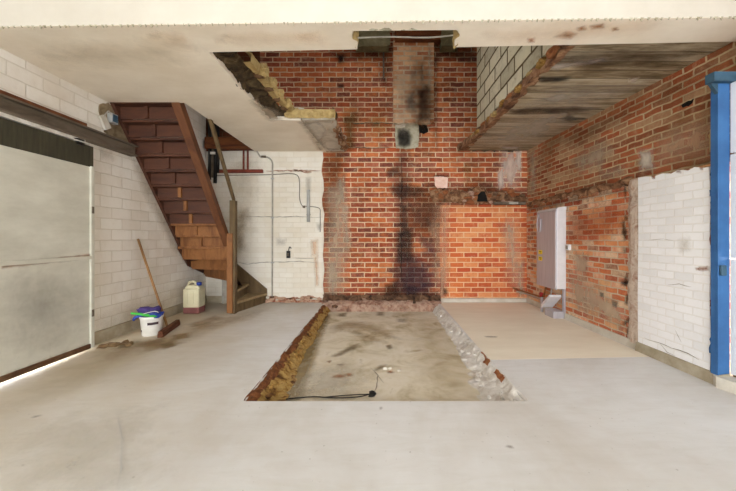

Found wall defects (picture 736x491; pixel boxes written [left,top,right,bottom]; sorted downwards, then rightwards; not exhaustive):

spalling [213,51,298,120]
leakage [408,90,427,117]
spalling [434,189,525,205]